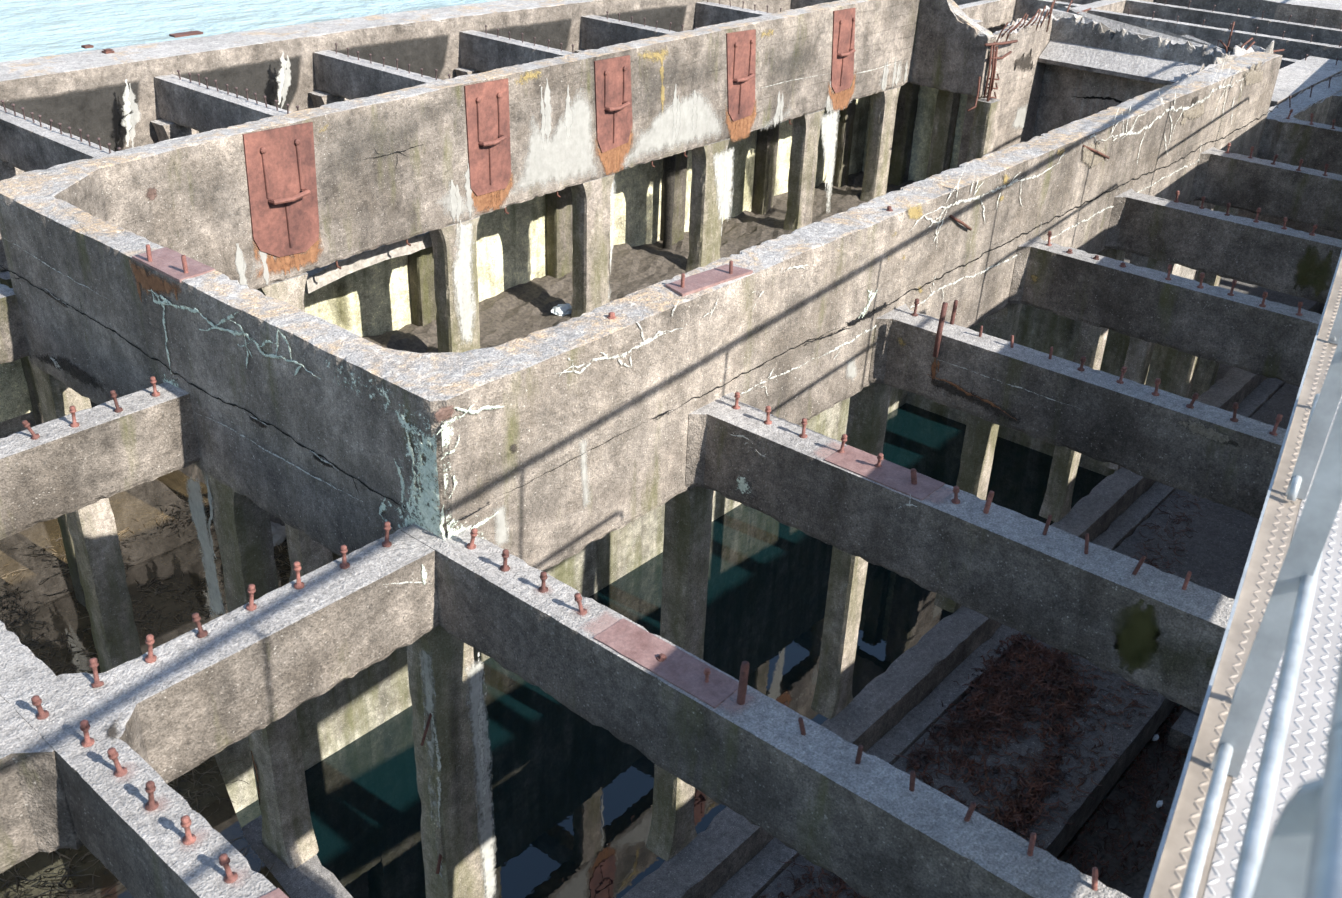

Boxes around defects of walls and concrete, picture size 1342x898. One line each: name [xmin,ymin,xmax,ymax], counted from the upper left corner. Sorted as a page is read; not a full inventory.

rust [828,76,856,110]
rust [726,101,757,142]
rust [595,131,633,175]
rust [471,175,512,213]
rust [255,238,321,275]
crack [493,57,1278,499]
crack [0,238,411,511]
spalling [435,405,455,422]